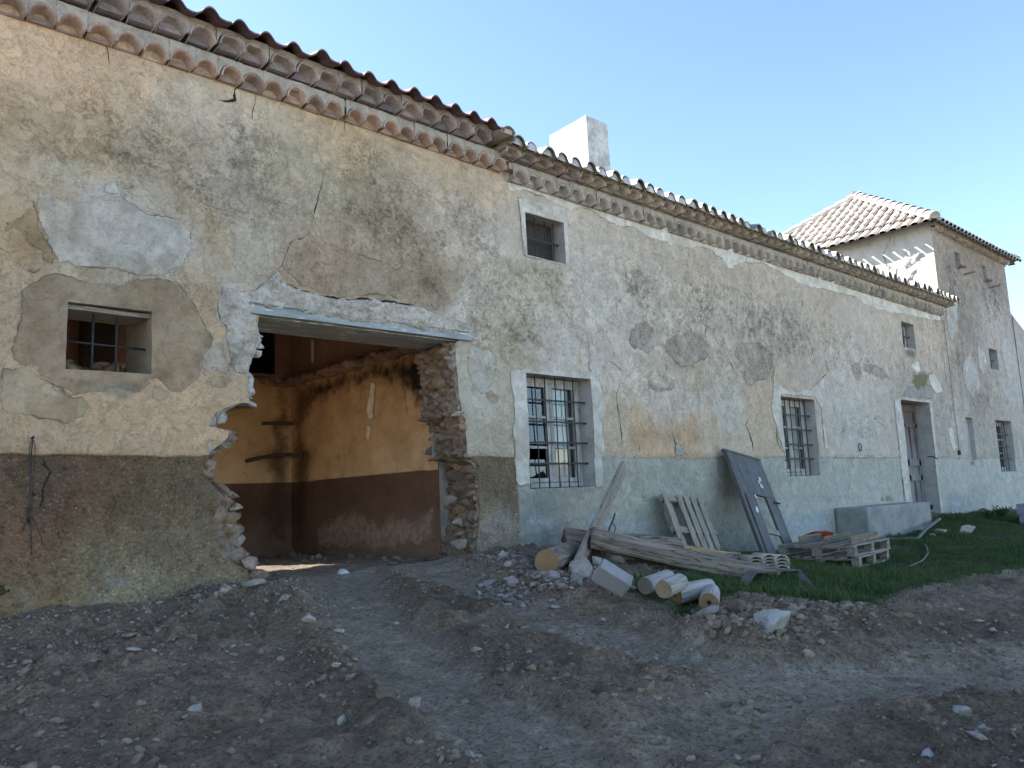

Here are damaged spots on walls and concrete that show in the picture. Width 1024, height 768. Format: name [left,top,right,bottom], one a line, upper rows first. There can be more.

peeling [5,179,459,408]
crack [241,180,418,307]
peeling [629,321,710,367]
peeling [506,172,958,340]
peeling [912,361,942,394]
spalling [226,491,270,579]